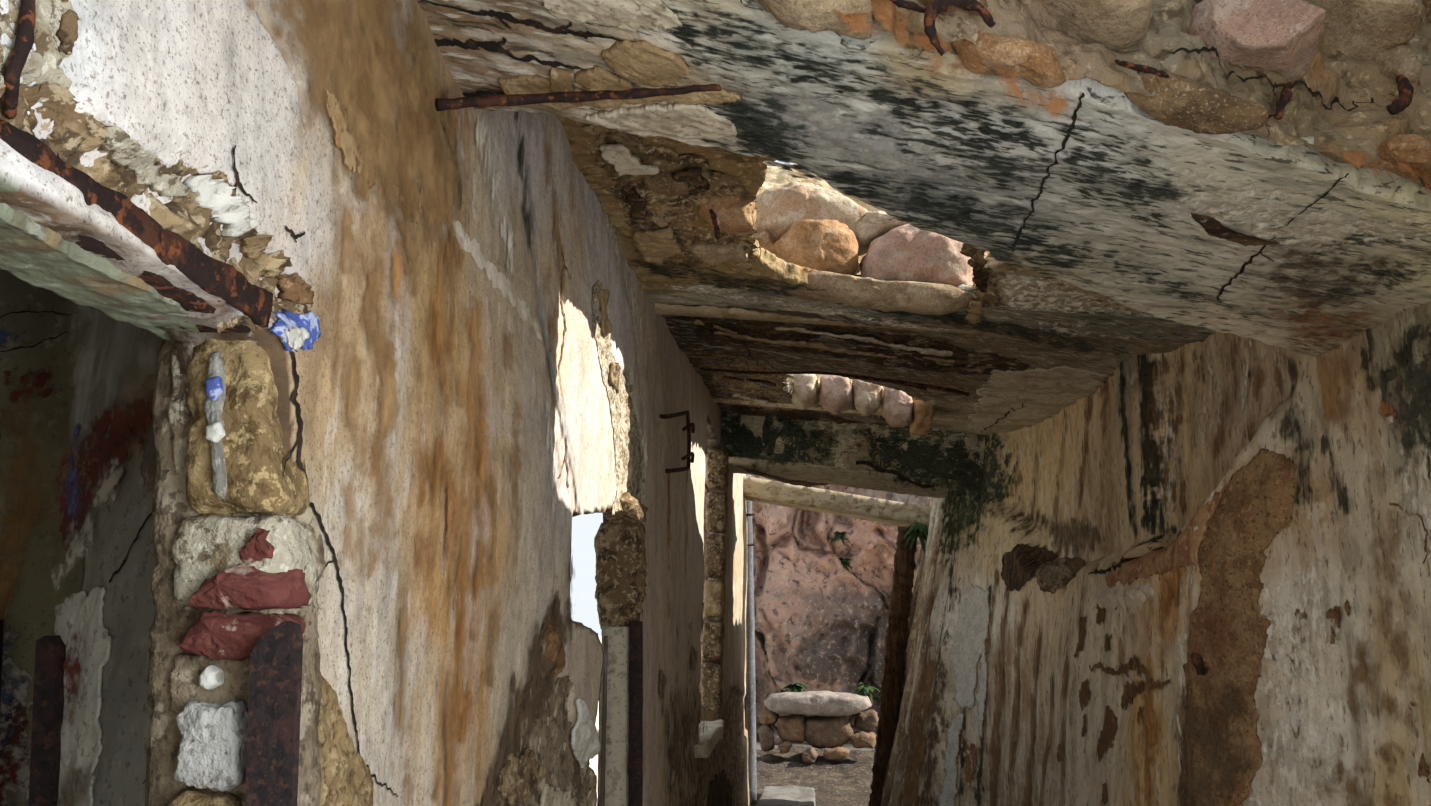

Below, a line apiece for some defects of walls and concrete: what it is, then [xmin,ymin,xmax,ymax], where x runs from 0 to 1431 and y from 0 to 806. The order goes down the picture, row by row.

corrosion [3,0,36,119]
spalling [0,0,321,352]
water stain [476,112,537,274]
corrosion [435,84,721,143]
corrosion [838,0,1068,116]
crack [1012,93,1085,252]
crack [1161,47,1375,137]
water stain [598,7,1431,806]
peeling [51,390,154,806]
crack [283,352,399,797]
spalling [492,624,601,806]
spalling [1106,448,1308,806]